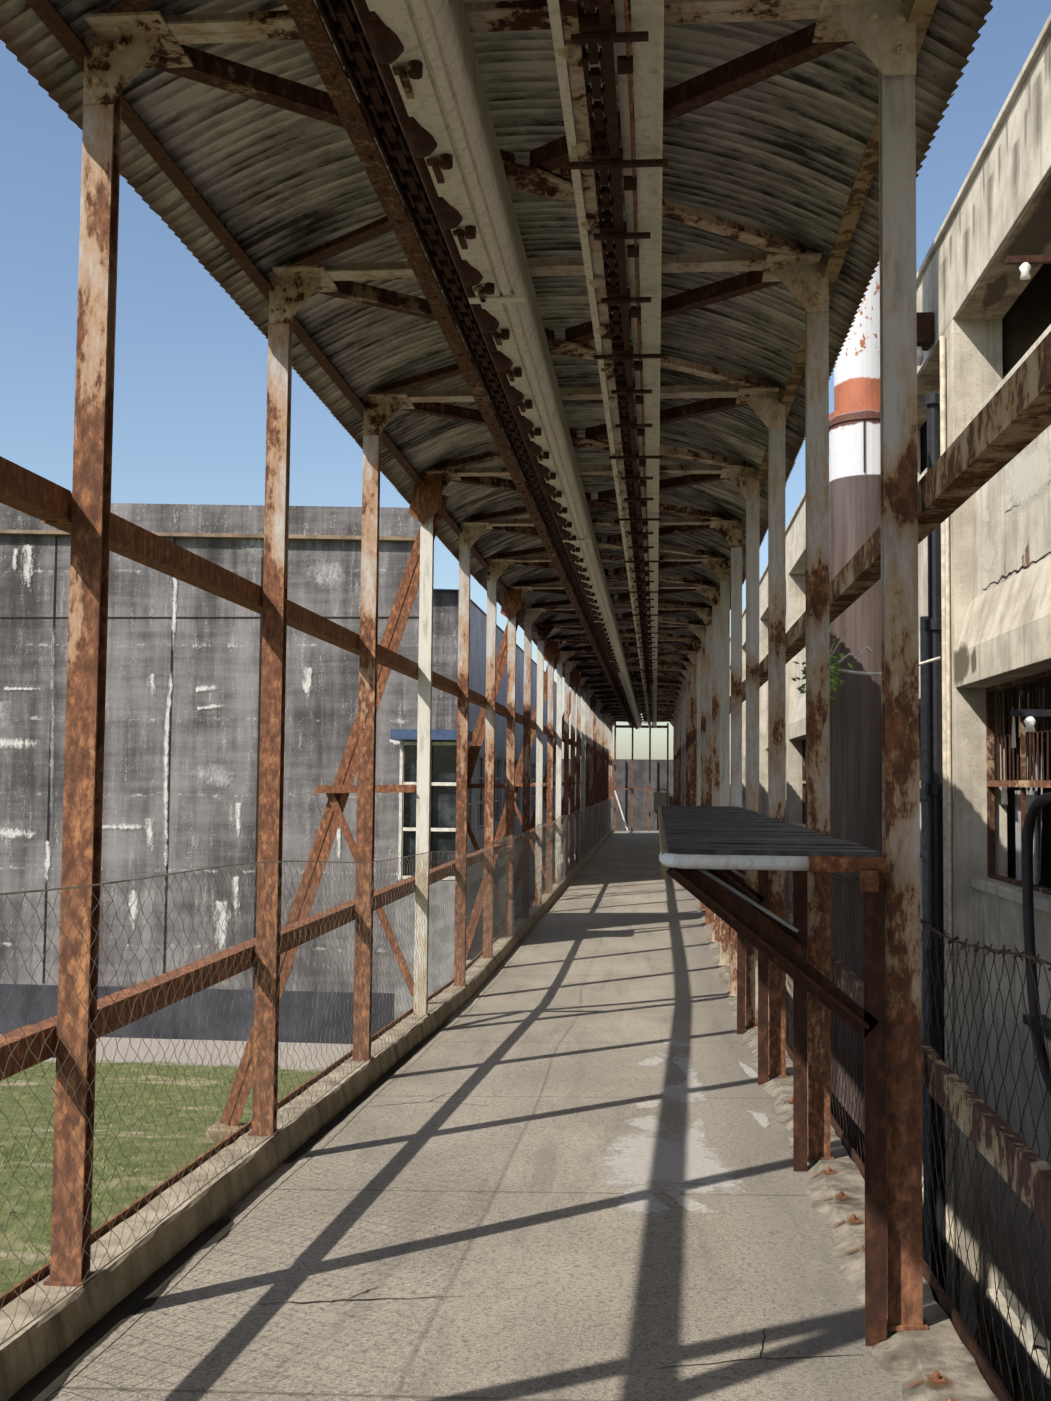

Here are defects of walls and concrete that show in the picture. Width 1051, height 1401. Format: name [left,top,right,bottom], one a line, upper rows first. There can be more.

water stain [12,545,33,586]
water stain [0,638,54,766]
water stain [0,828,50,880]